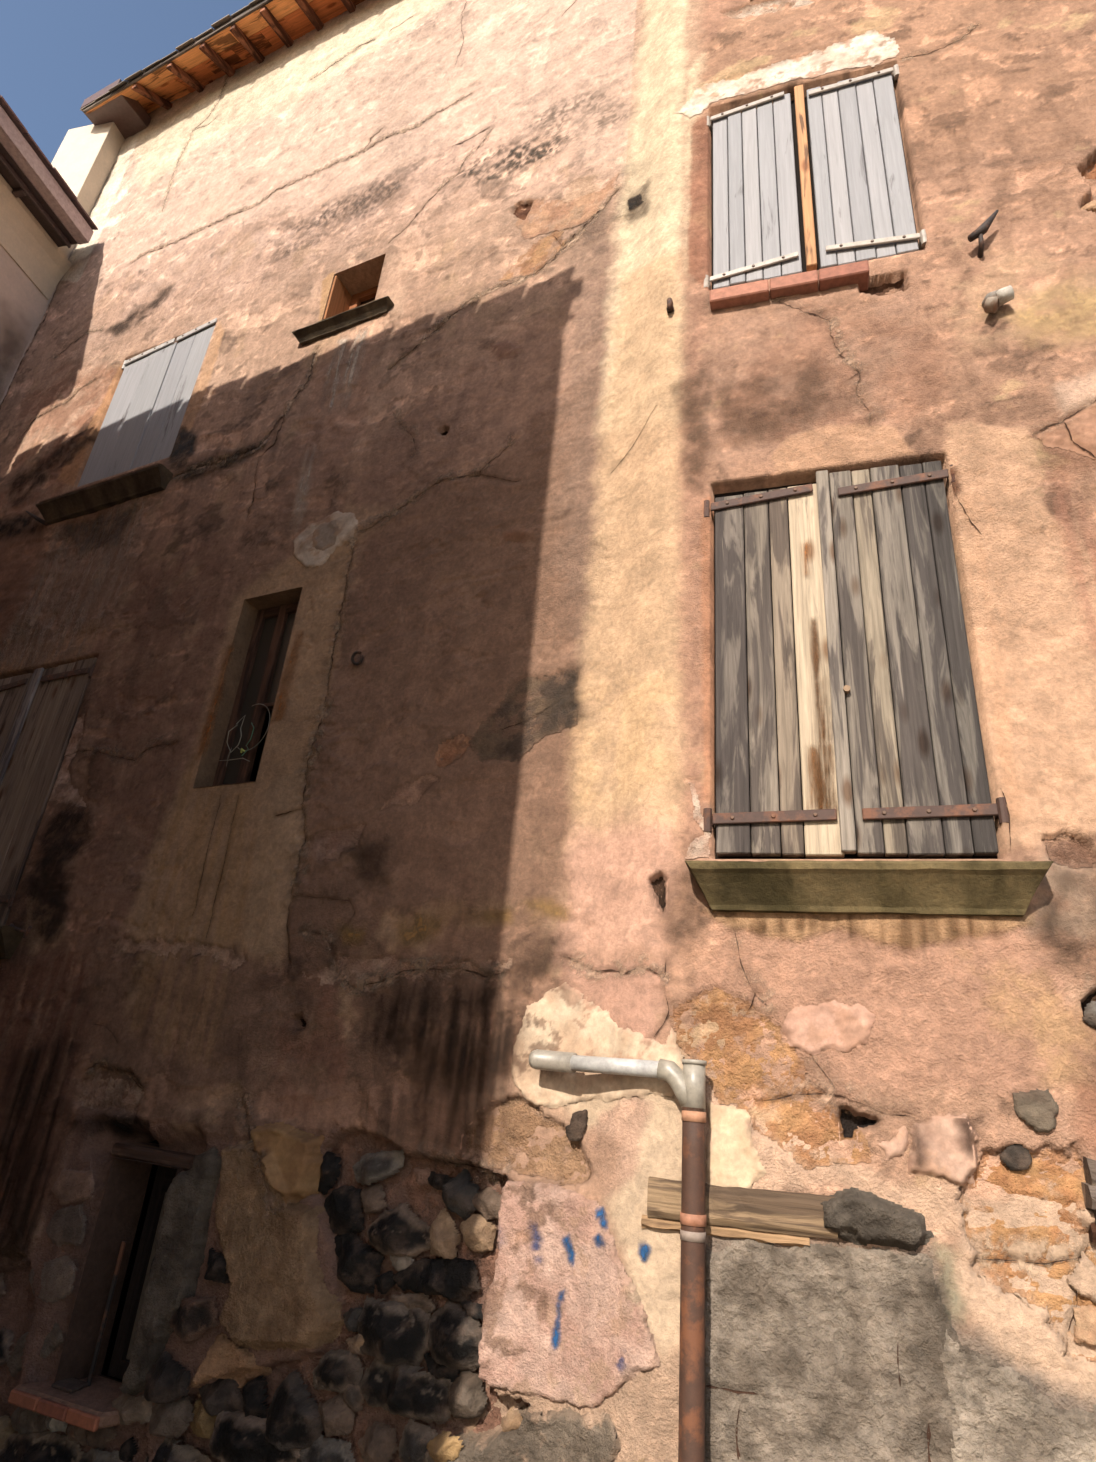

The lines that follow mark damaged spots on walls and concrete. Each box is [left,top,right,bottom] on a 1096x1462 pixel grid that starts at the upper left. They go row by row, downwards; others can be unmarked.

crack [175,345,320,517]
crack [134,3,492,262]
crack [390,185,622,369]
crack [771,297,871,415]
crack [1035,400,1096,458]
spalling [1081,159,1096,213]
water stain [0,424,148,664]
water stain [32,809,88,942]
water stain [0,1042,60,1250]
water stain [387,980,512,1155]
spalling [669,987,1096,1362]
flaking render [0,1097,651,1462]